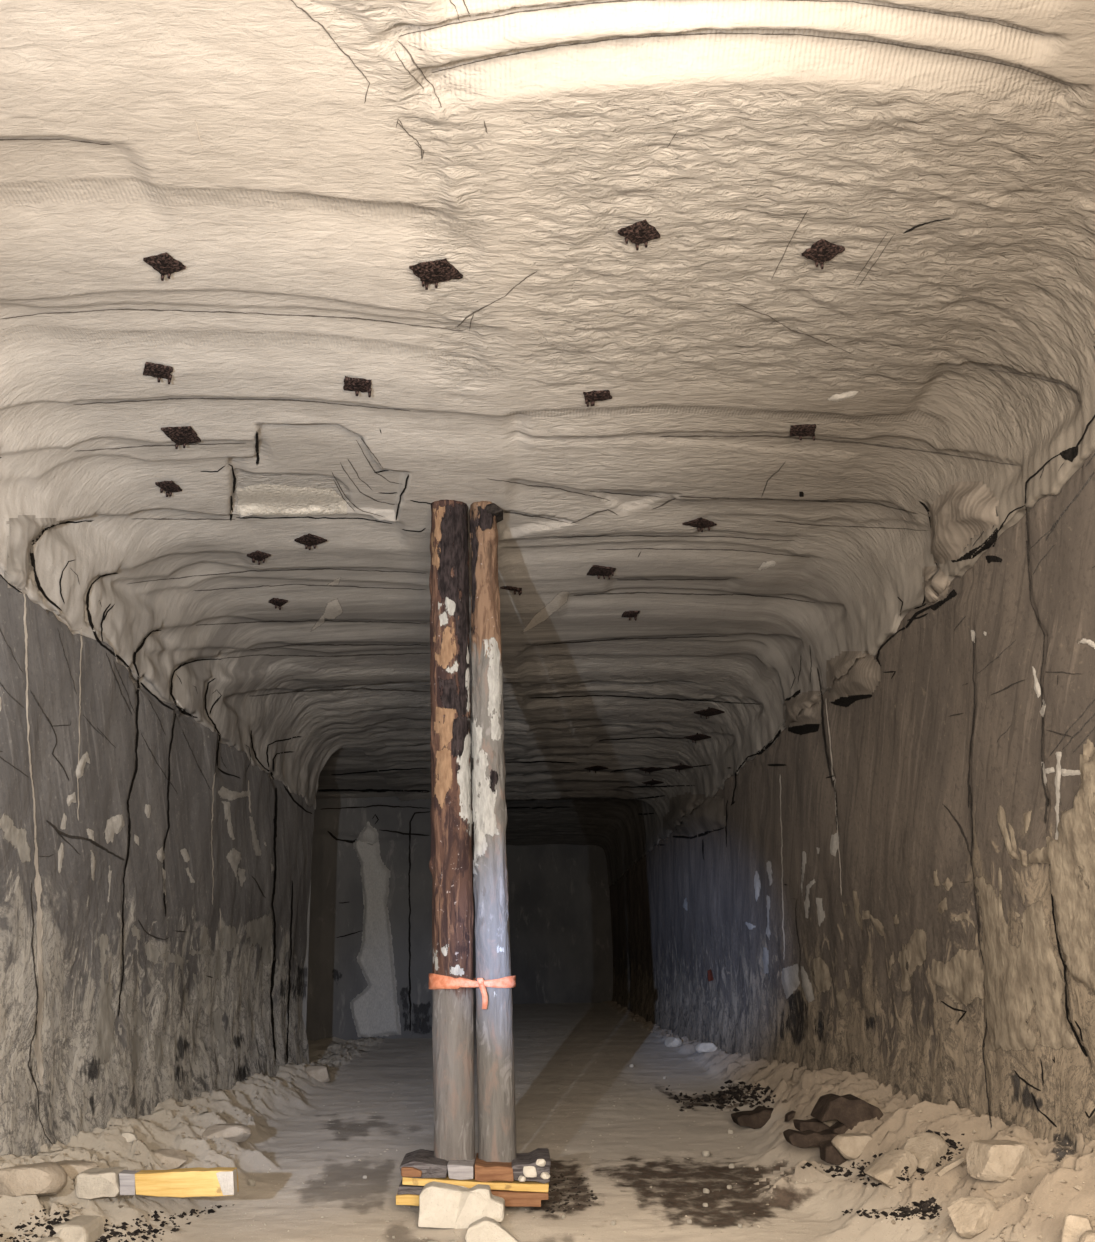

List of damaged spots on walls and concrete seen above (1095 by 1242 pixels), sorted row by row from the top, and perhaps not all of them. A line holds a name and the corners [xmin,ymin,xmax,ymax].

crack [291,0,370,102]
crack [396,119,424,158]
spalling [236,484,348,517]
crack [876,595,941,679]
crack [944,415,1095,965]
crack [0,520,430,1144]
crack [941,864,1088,1127]